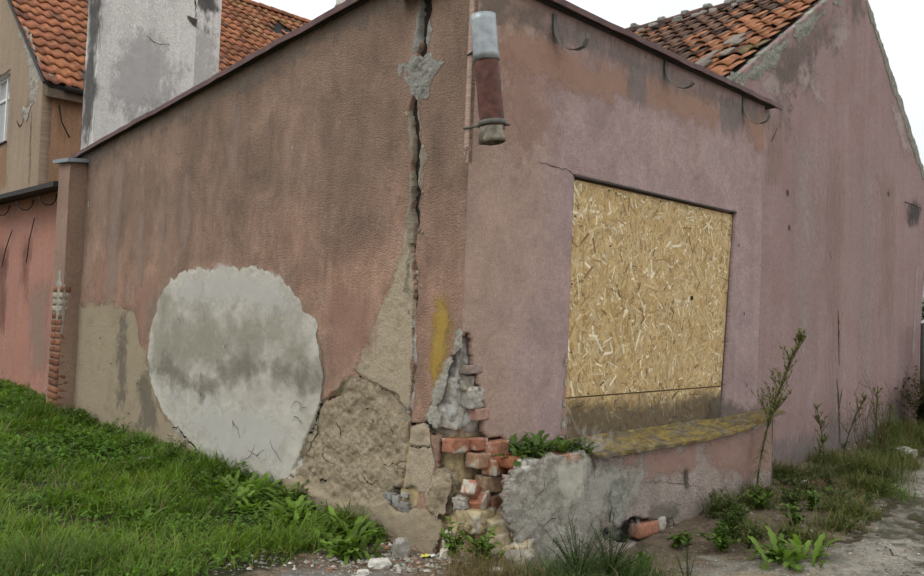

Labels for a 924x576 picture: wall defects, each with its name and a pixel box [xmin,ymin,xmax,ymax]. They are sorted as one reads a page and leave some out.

crack [411,0,432,57]
corrosion [475,57,505,130]
flaking render [726,0,849,103]
flaking render [866,0,924,179]
crack [403,100,429,329]
damp [429,297,449,381]
spalling [295,229,536,562]